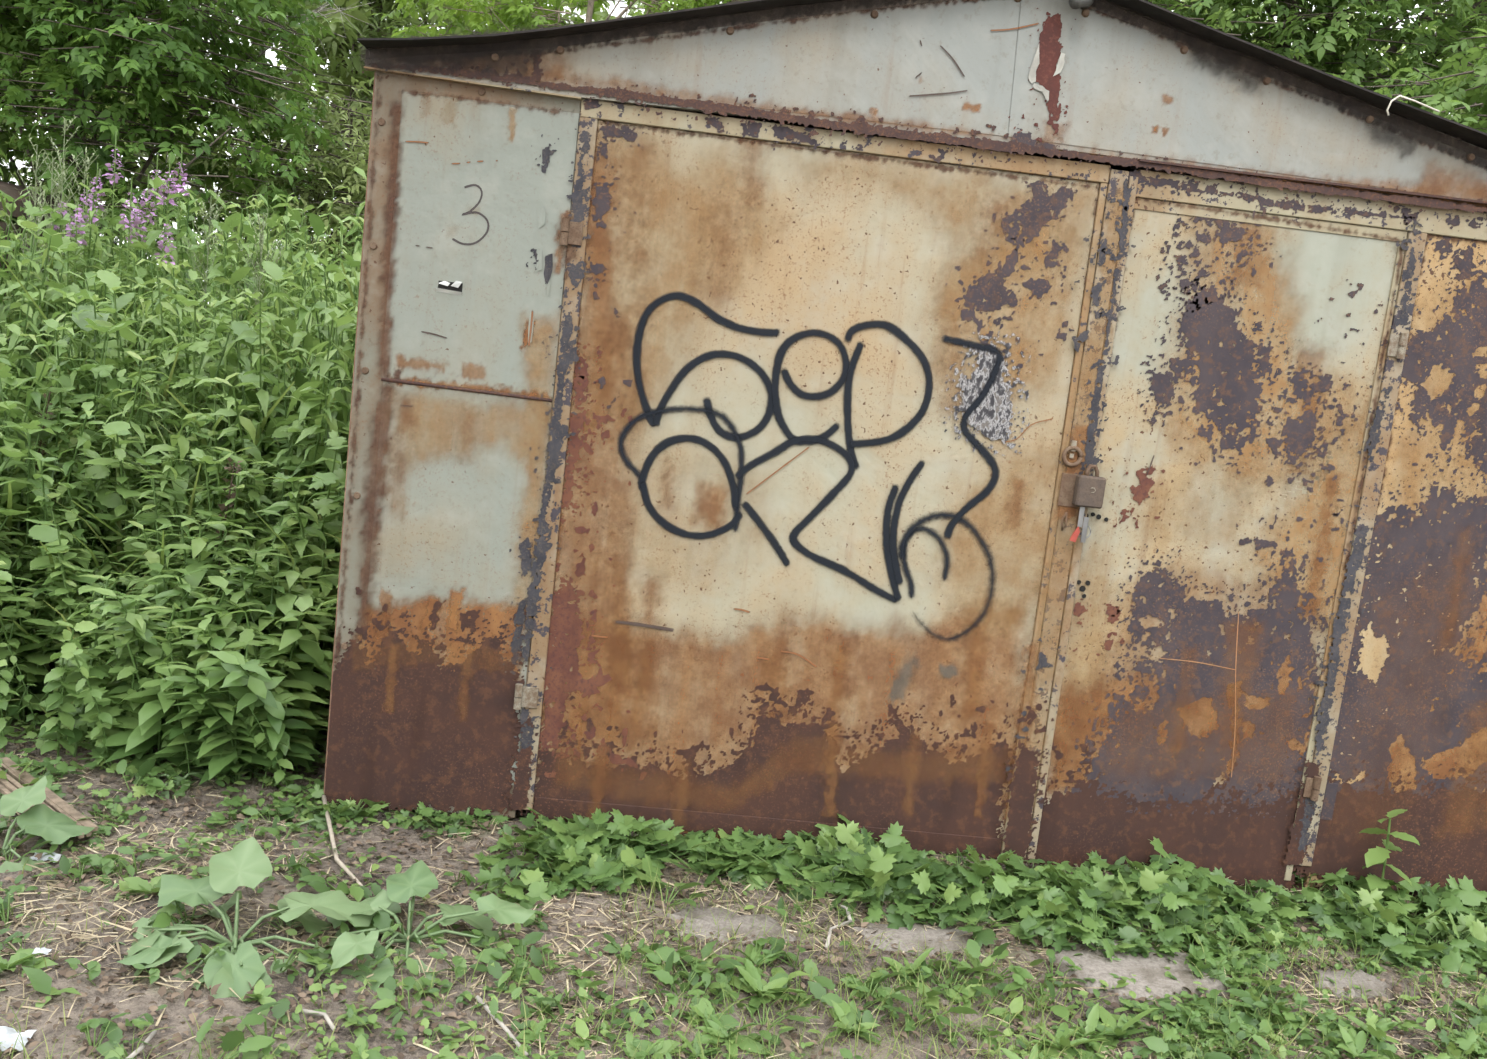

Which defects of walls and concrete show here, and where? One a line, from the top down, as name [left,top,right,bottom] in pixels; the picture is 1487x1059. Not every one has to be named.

corrosion [785,0,985,24]
corrosion [605,23,759,47]
peeling [675,110,869,155]
peeling [926,141,976,168]
peeling [946,8,1487,855]
corrosion [325,49,1487,900]